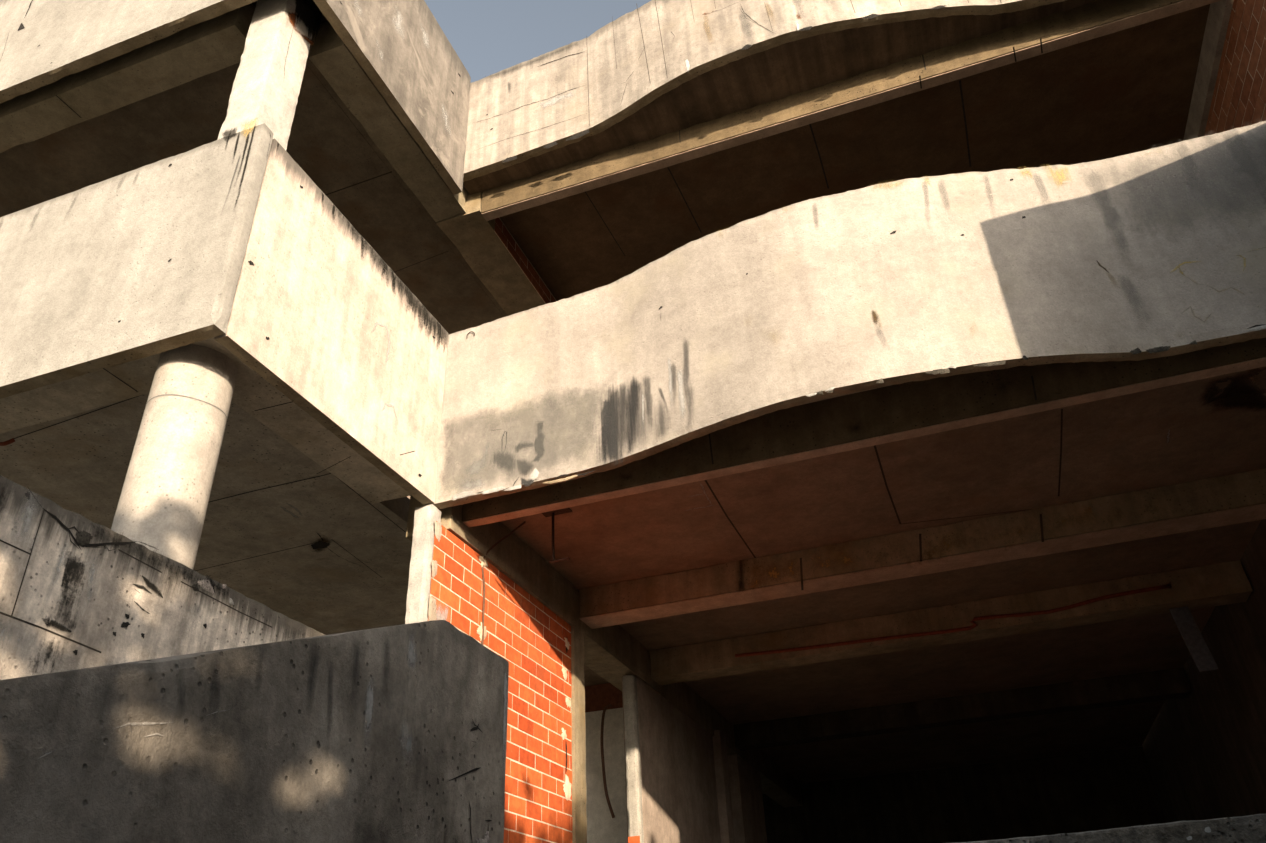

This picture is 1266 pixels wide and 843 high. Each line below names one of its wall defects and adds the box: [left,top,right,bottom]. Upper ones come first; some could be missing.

damp [222,127,255,204]
damp [322,193,446,350]
damp [601,348,688,462]
damp [1202,368,1266,410]
crack [28,488,159,551]